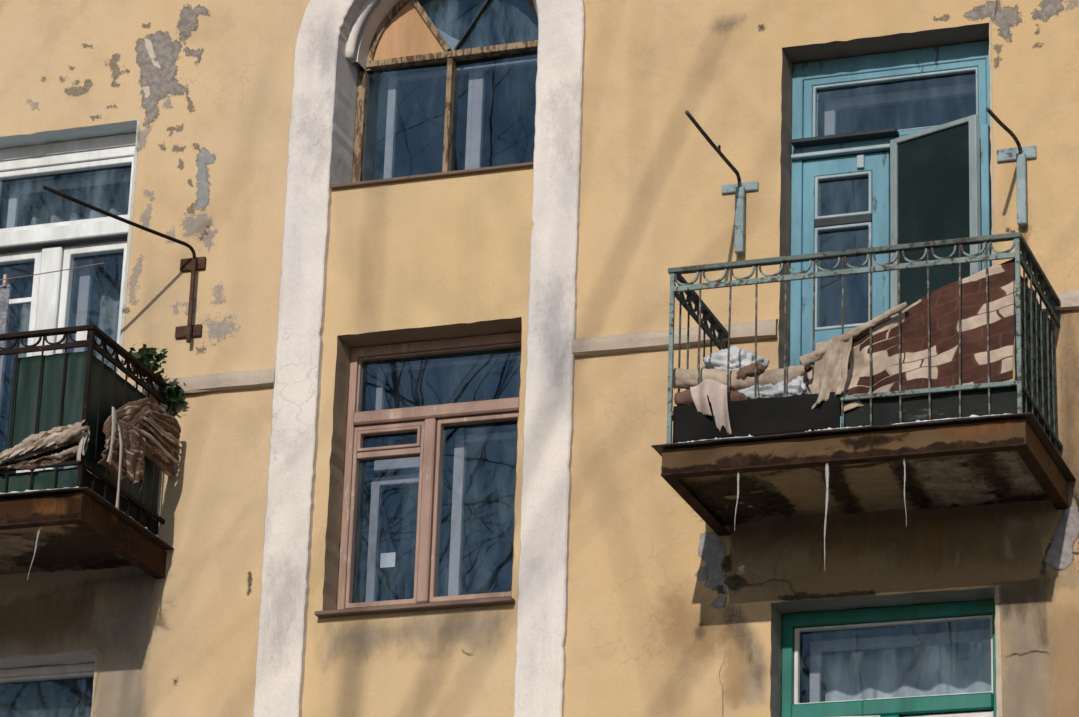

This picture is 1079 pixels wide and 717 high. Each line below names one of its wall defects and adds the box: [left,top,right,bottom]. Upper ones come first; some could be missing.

peeling [60,66,92,97]
peeling [105,4,210,151]
peeling [964,0,1078,68]
peeling [159,123,217,249]
peeling [122,257,142,313]
peeling [196,316,238,353]
corrosion [662,426,1024,474]
spalling [689,451,1048,609]
flaking render [1041,490,1079,585]
water stain [0,524,155,717]
water stain [1003,580,1046,717]